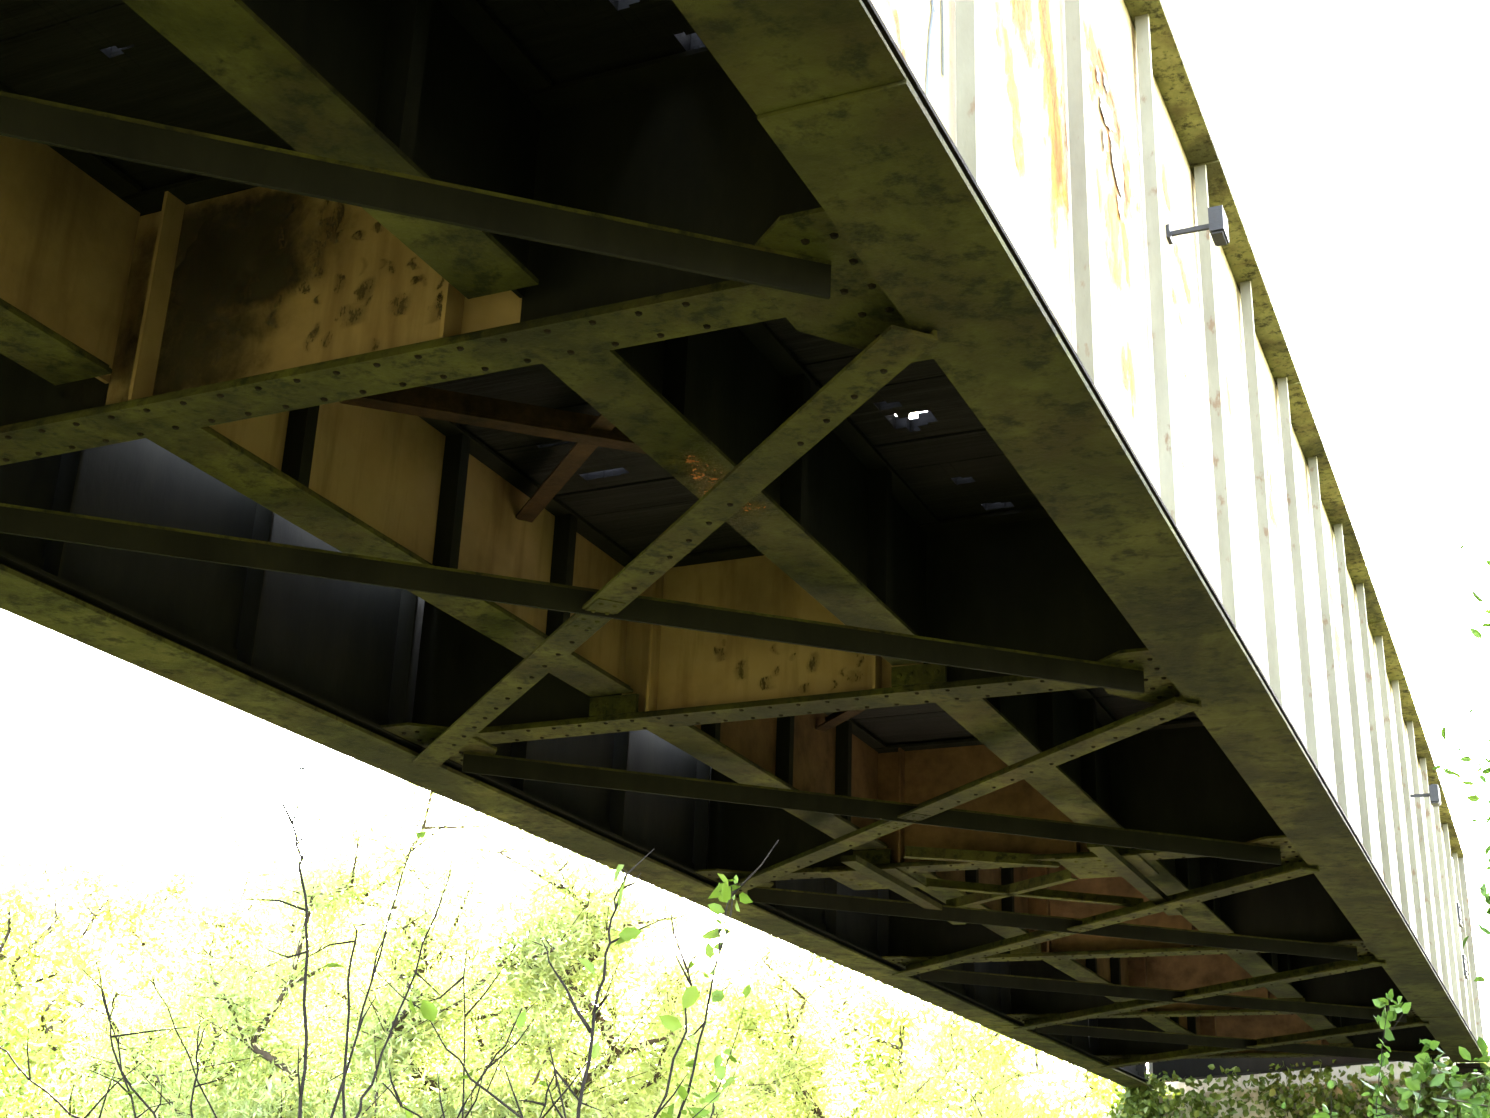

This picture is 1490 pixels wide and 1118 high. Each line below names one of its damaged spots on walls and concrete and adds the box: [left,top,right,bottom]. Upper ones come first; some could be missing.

rust [996,0,1069,290]
water stain [267,200,382,350]
rust [1118,339,1137,419]